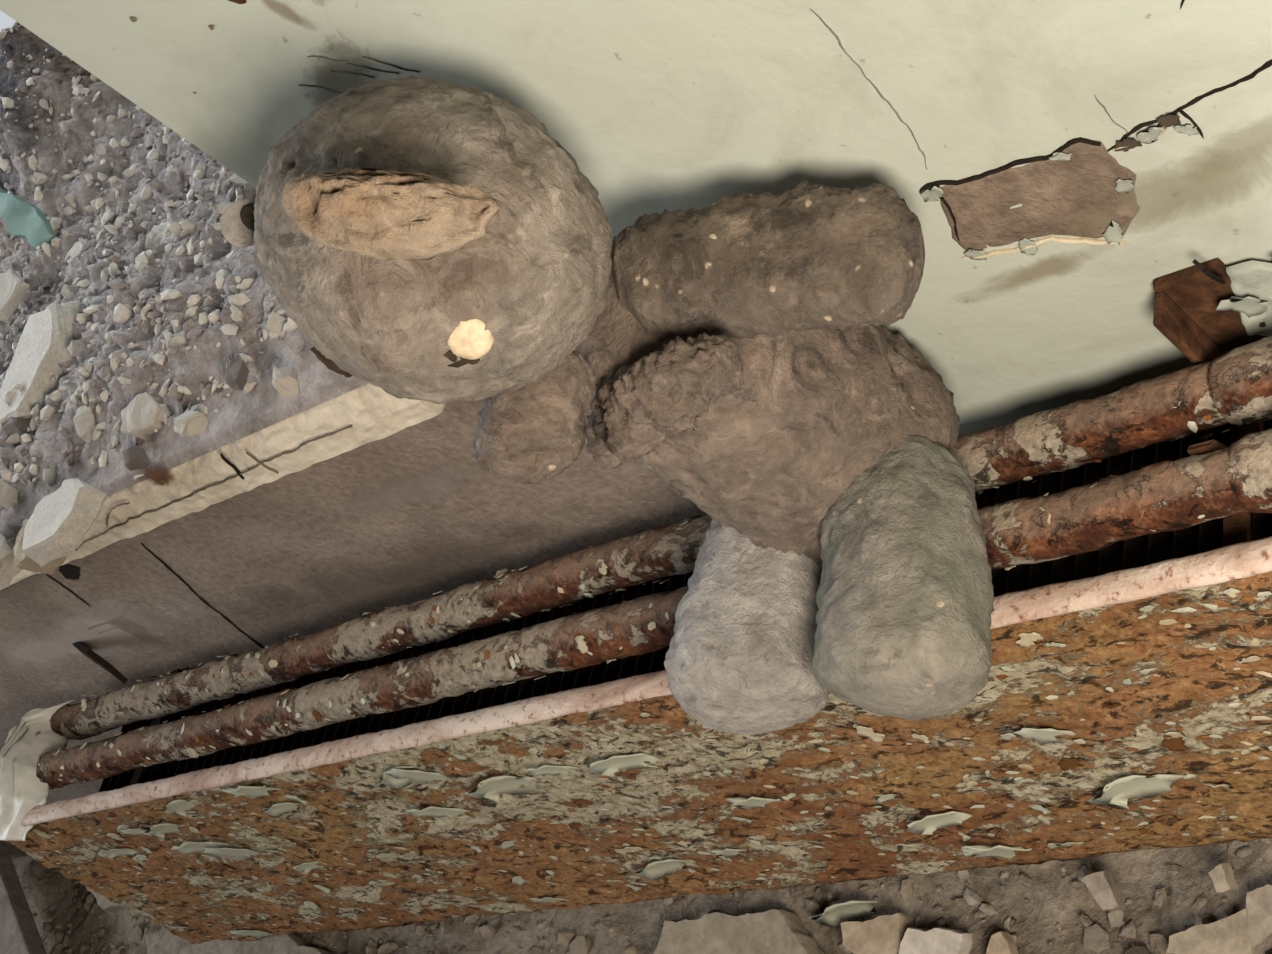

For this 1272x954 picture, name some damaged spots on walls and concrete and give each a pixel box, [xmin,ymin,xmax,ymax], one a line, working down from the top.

crack [810,8,927,169]
crack [1095,59,1272,152]
spalling [919,137,1140,261]
peeling [1216,260,1272,336]